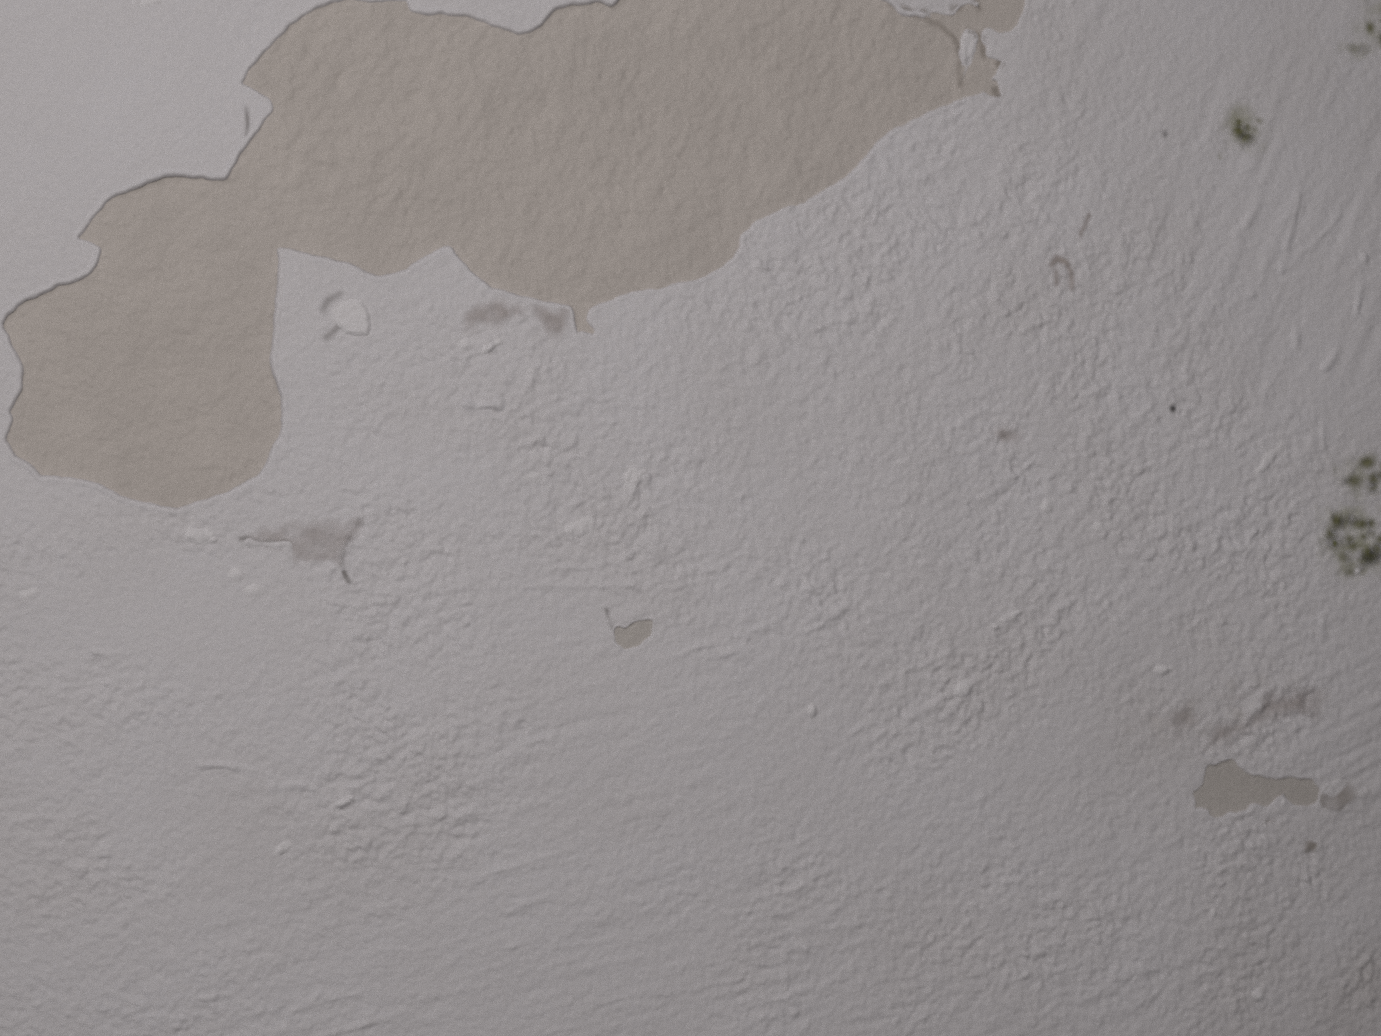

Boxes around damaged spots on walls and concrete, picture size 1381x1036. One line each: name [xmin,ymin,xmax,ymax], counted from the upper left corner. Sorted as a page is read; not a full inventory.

peeling [0,0,1027,516]
peeling [611,616,656,652]
peeling [1191,756,1347,821]